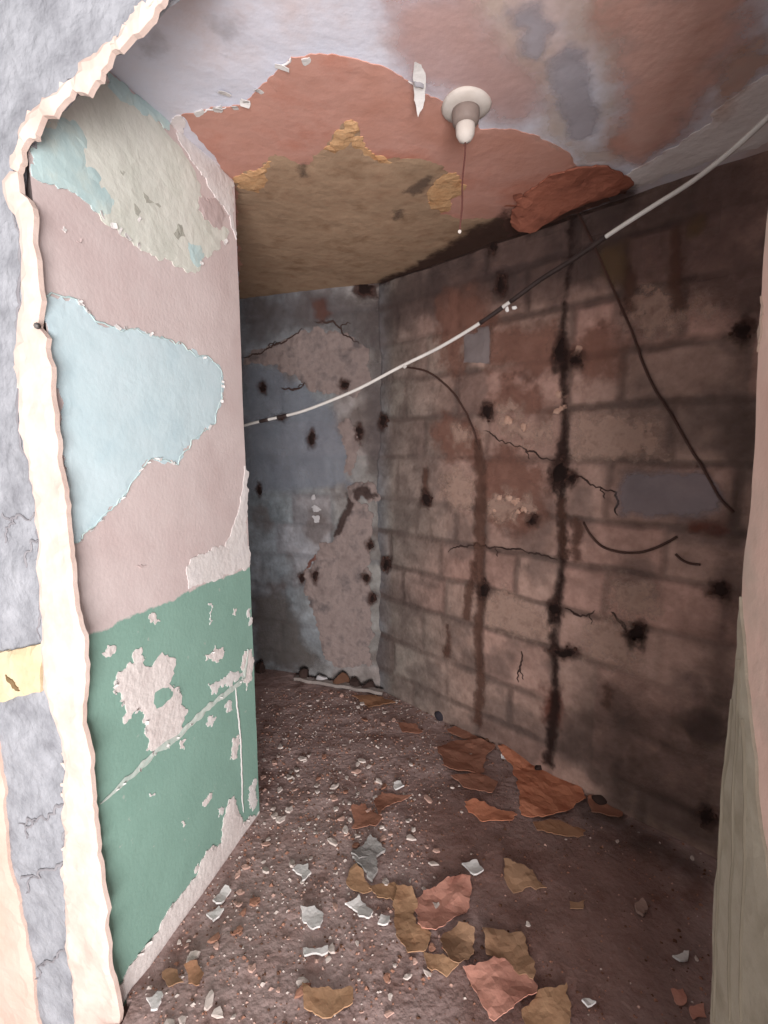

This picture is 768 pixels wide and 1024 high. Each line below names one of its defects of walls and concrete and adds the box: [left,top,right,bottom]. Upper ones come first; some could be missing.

leakage [587,0,752,163]
crack [244,320,361,358]
crack [487,431,554,461]
leakage [556,366,569,459]
spalling [2,0,583,1024]
leakage [463,440,487,726]
crack [448,542,555,559]
crack [516,651,524,682]
leakage [543,487,583,769]
crack [579,476,619,516]